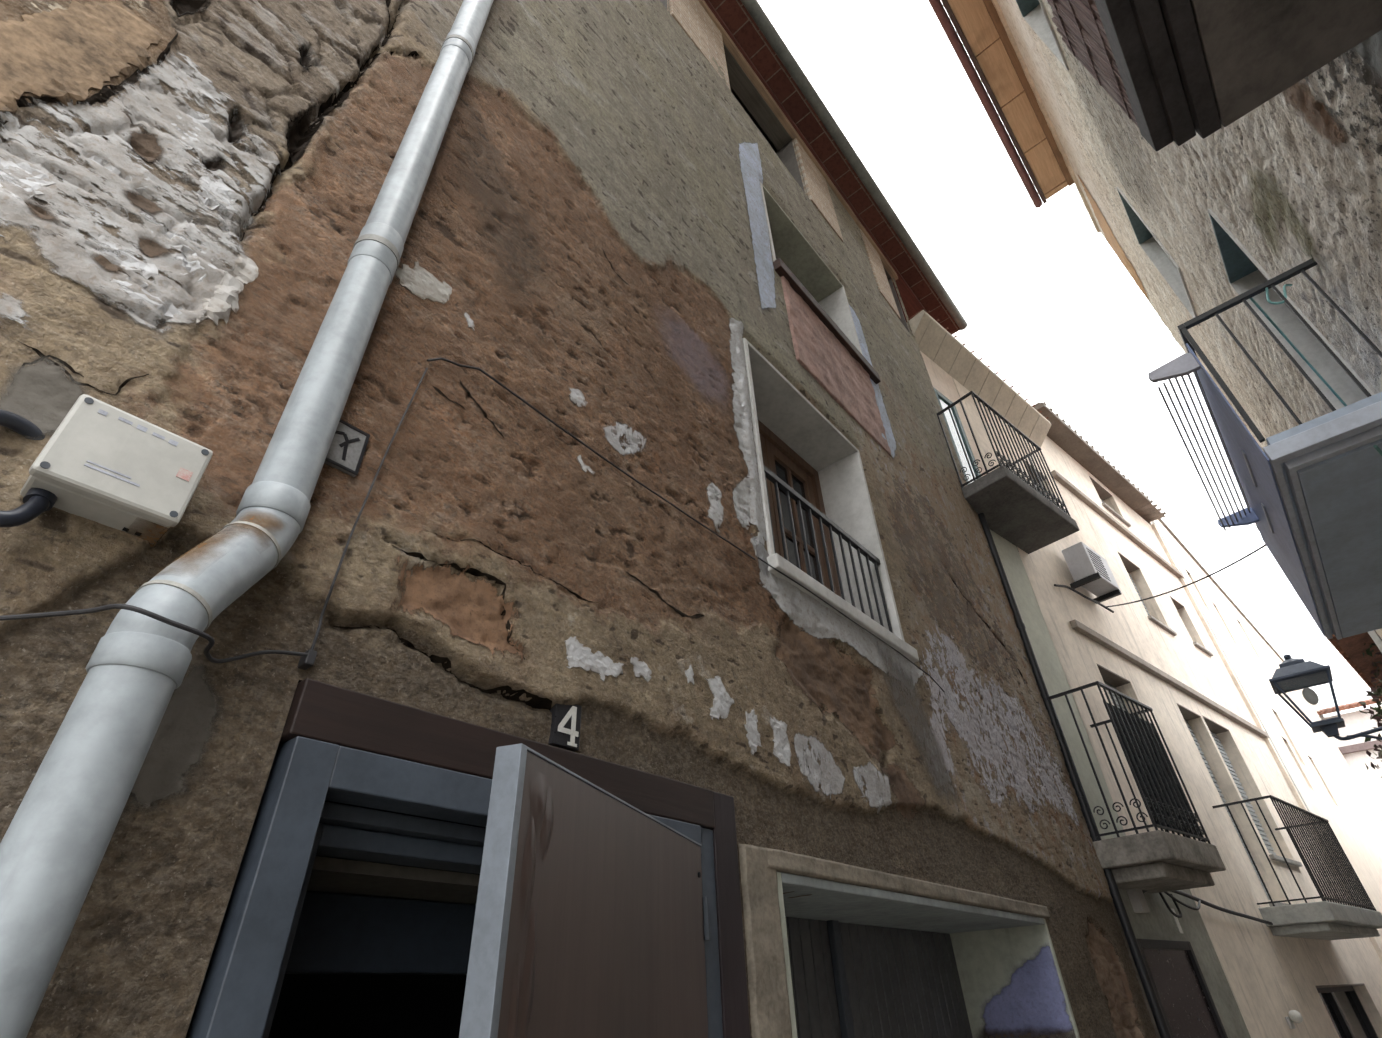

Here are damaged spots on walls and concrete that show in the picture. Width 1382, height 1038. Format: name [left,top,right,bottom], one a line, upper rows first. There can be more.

crack [0,33,178,127]
crack [241,0,419,241]
peeling [0,52,282,333]
peeling [394,261,452,304]
spalling [390,555,525,662]
crack [333,531,596,710]
peeling [565,636,652,682]
crack [625,571,704,619]
peeling [685,303,1080,828]